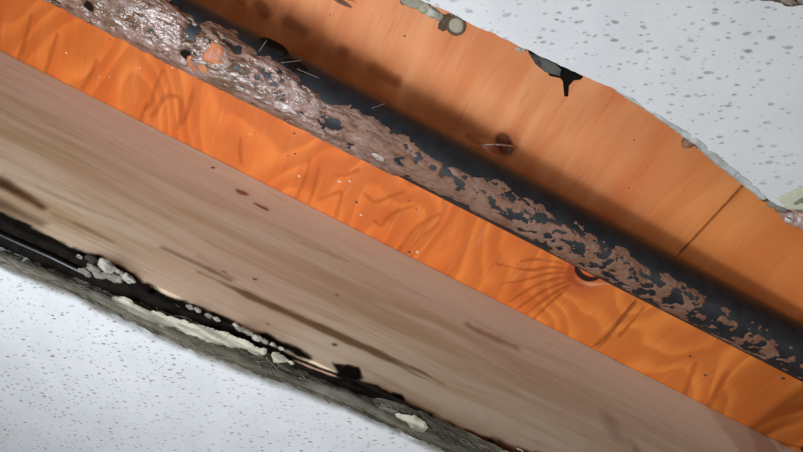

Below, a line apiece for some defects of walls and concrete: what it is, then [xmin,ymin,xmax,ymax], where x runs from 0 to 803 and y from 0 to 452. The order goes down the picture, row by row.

spalling [776,187,803,211]
peeling [112,296,294,365]
water stain [0,202,528,452]